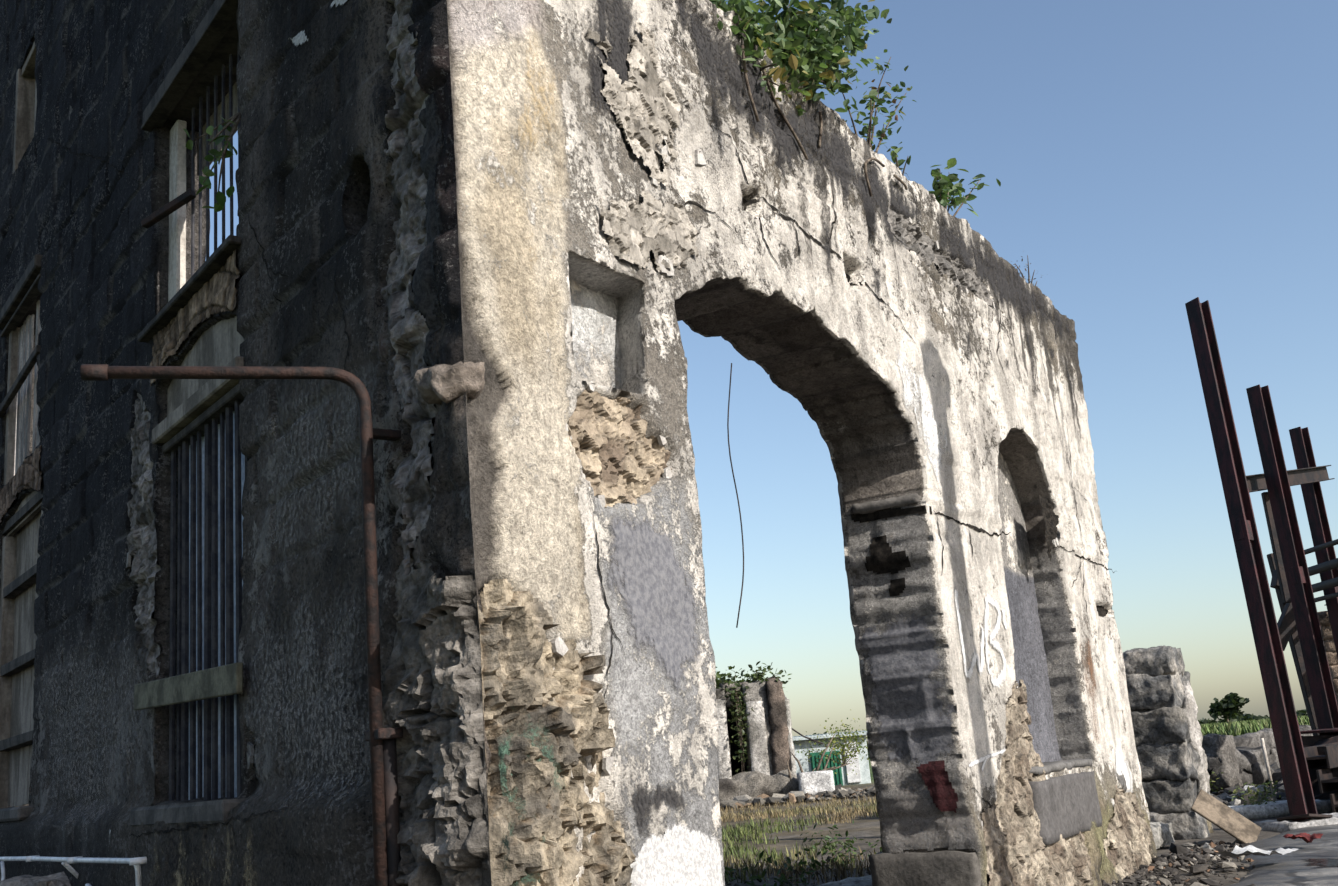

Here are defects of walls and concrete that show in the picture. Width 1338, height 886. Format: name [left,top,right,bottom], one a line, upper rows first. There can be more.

leakage [573,0,638,134]
peeling [584,22,700,276]
peeling [695,149,707,166]
leakage [675,0,921,246]
flaking render [126,393,161,677]
flaking render [381,0,438,575]
flaking render [565,381,672,508]
leakage [871,261,882,306]
crack [851,505,1011,572]
leakage [936,217,1078,509]
flaking render [477,579,636,886]
flaking render [980,679,1156,886]